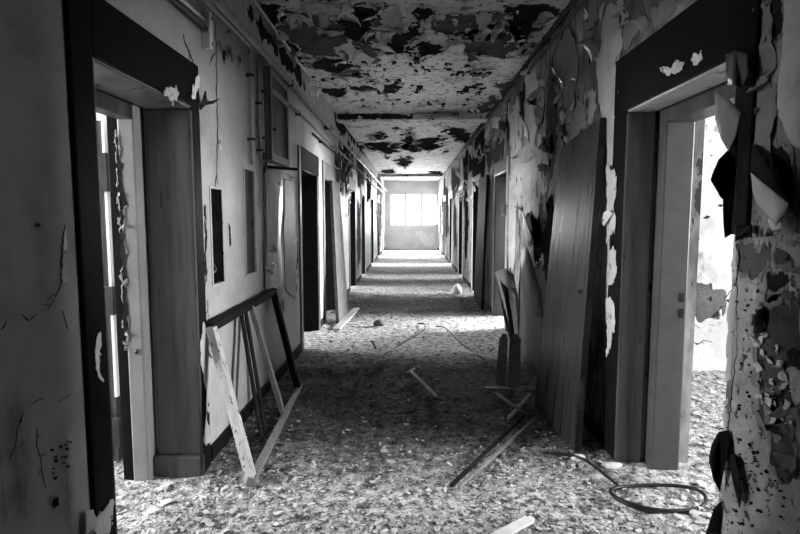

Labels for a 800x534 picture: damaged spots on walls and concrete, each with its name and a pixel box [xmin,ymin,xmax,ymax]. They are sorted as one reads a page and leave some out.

peeling [163,85,179,106]
peeling [192,74,220,110]
peeling [660,50,703,76]
peeling [242,0,691,358]
crack [1,225,68,330]
peeling [114,129,138,355]
spalling [695,0,800,534]
peeling [94,332,104,382]
crack [9,394,71,487]